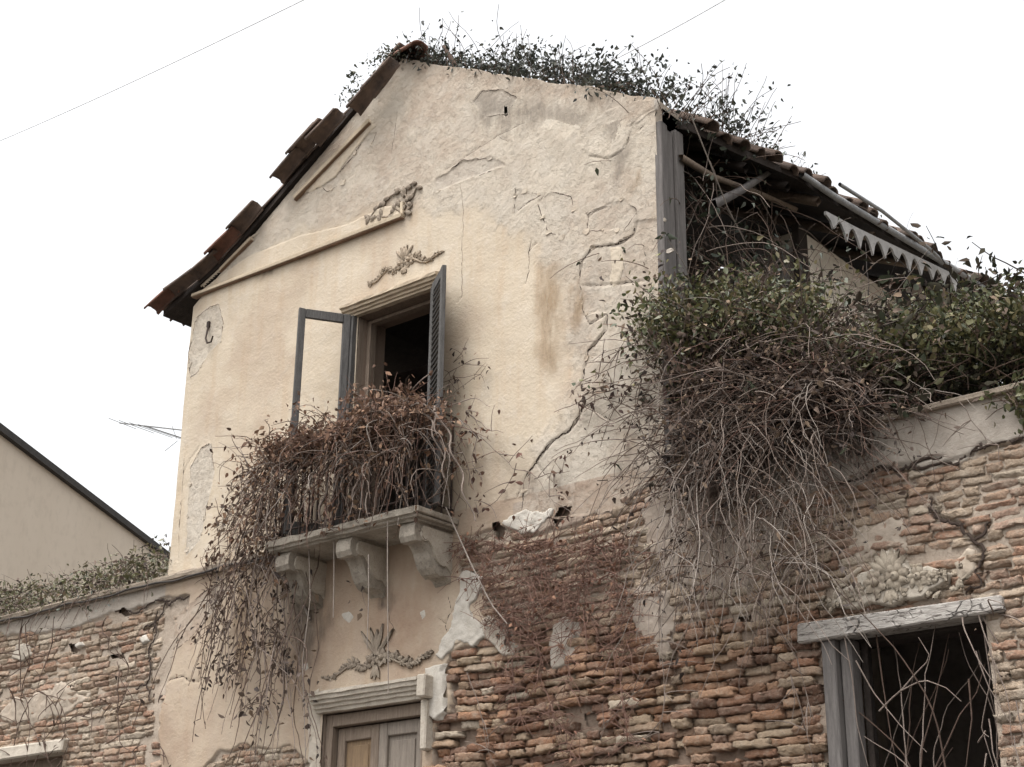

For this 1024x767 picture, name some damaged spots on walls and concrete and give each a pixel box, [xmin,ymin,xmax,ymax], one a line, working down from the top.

crack [447,123,523,303]
flaking render [187,304,224,378]
crack [517,207,642,501]
flaking render [184,442,215,555]
flaking render [150,742,162,767]
flaking render [206,743,309,767]